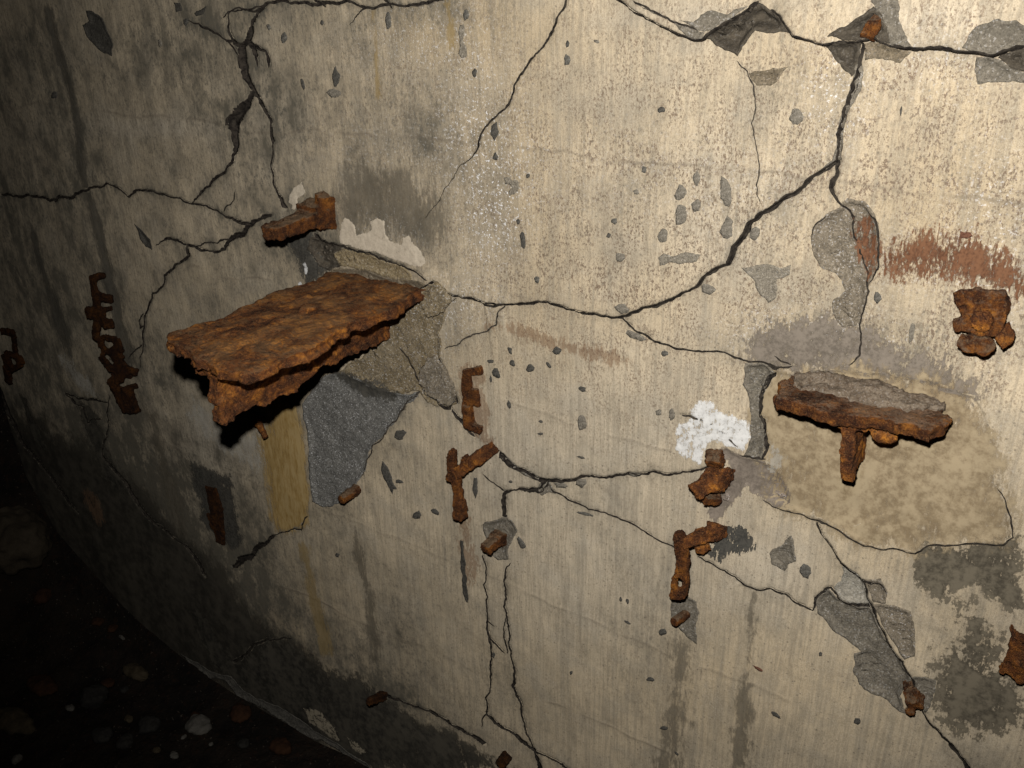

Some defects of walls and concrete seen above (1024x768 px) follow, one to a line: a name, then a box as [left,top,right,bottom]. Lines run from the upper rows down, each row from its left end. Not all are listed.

spalling [680,3,789,56]
spalling [962,19,1024,84]
crack [1,0,443,367]
crack [314,0,1024,477]
corrosion [850,215,1024,302]
corrosion [84,272,142,414]
spalling [302,218,459,507]
corrosion [461,365,484,435]
crack [483,451,707,548]
leakage [675,400,751,465]
spalling [816,566,936,714]
leakage [913,535,1024,742]